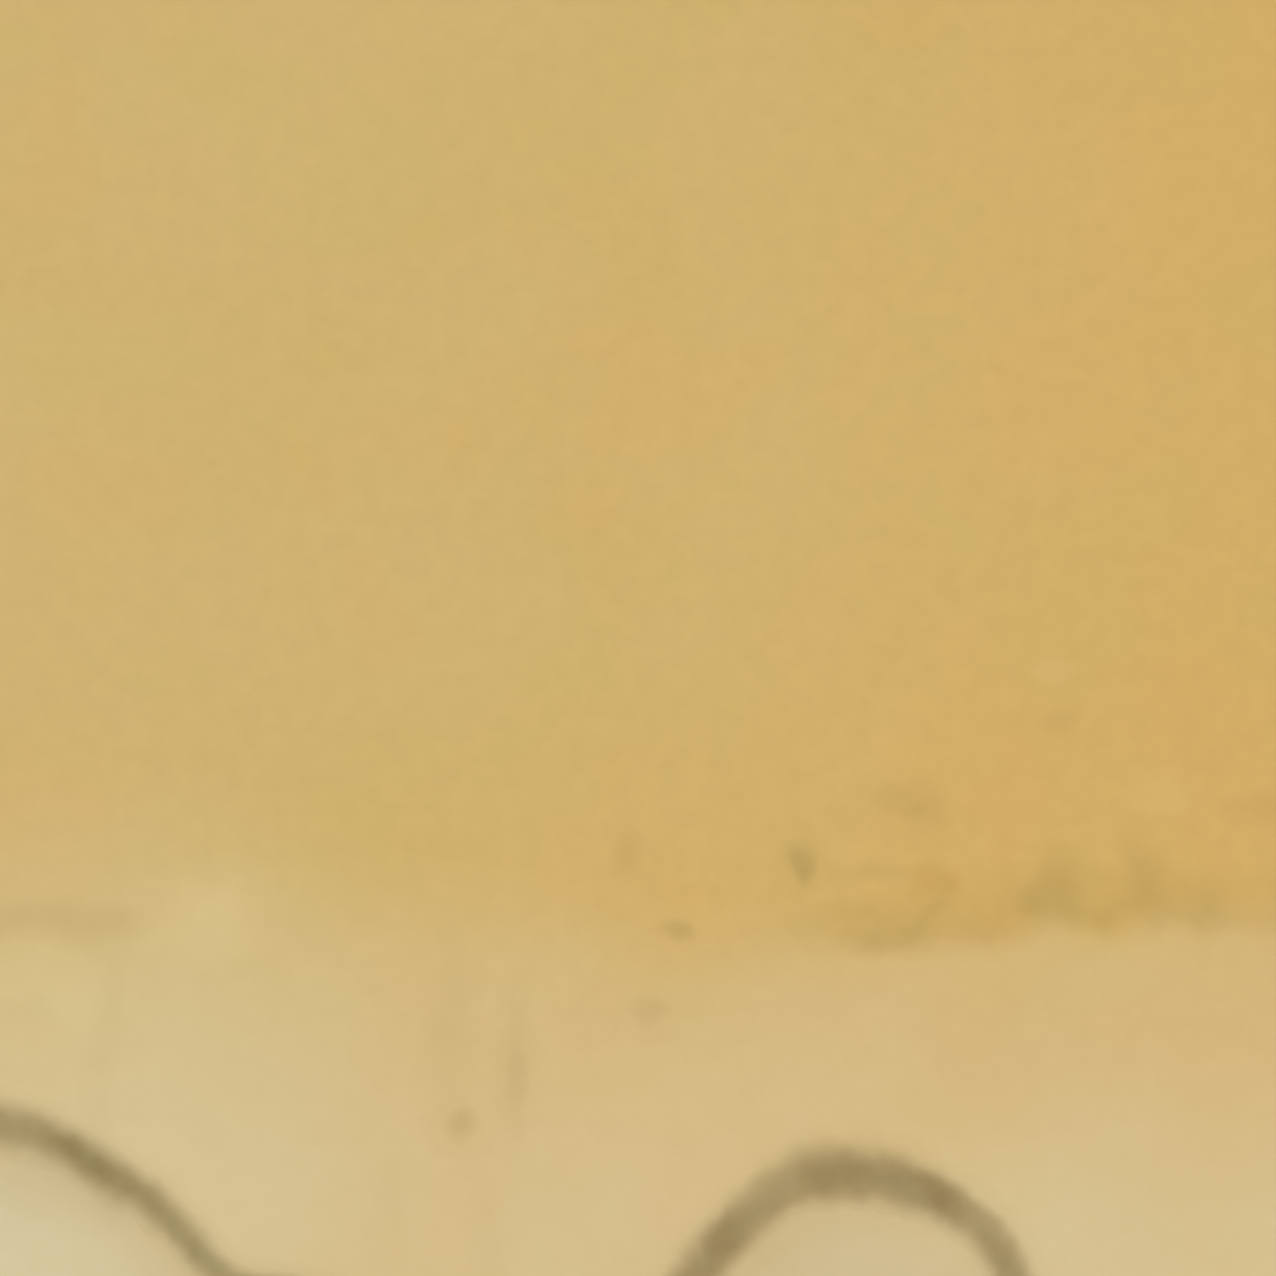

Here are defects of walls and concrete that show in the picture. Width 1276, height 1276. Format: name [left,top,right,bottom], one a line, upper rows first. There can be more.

leakage [0,749,1276,1276]